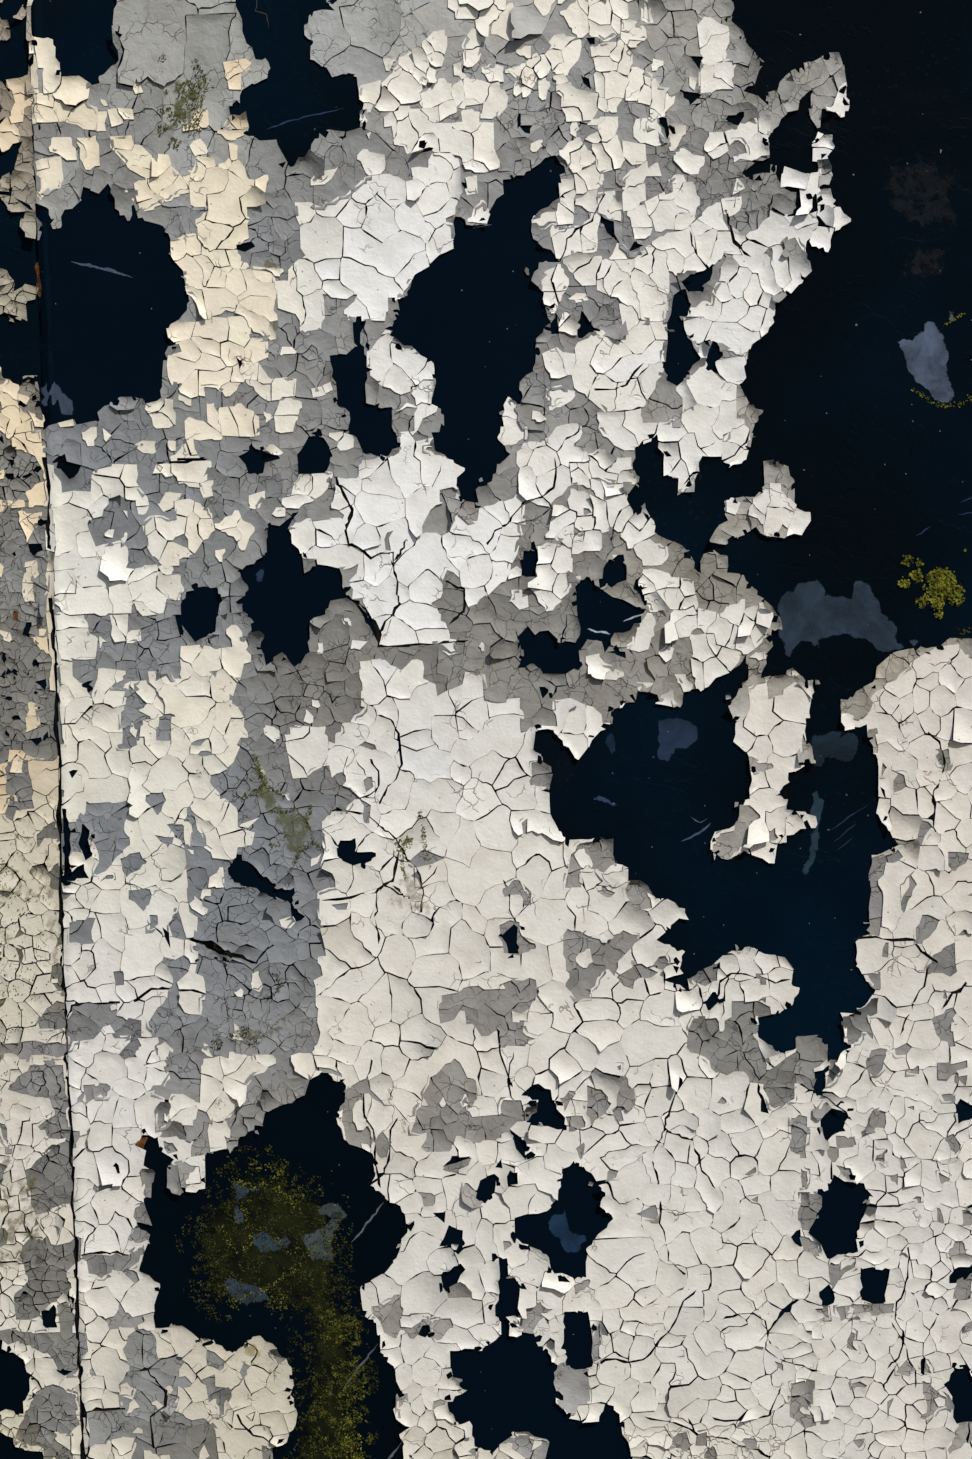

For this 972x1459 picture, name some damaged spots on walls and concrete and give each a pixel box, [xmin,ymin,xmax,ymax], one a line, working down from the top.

peeling [0,18,10,40]
peeling [0,67,42,240]
peeling [0,268,39,322]
crack [43,457,51,552]
crack [336,480,466,647]
peeling [28,0,903,874]
peeling [898,314,954,403]
crack [51,598,168,1459]
crack [332,845,437,942]
peeling [0,362,972,1459]
crack [854,935,967,1033]
crack [652,1082,715,1271]